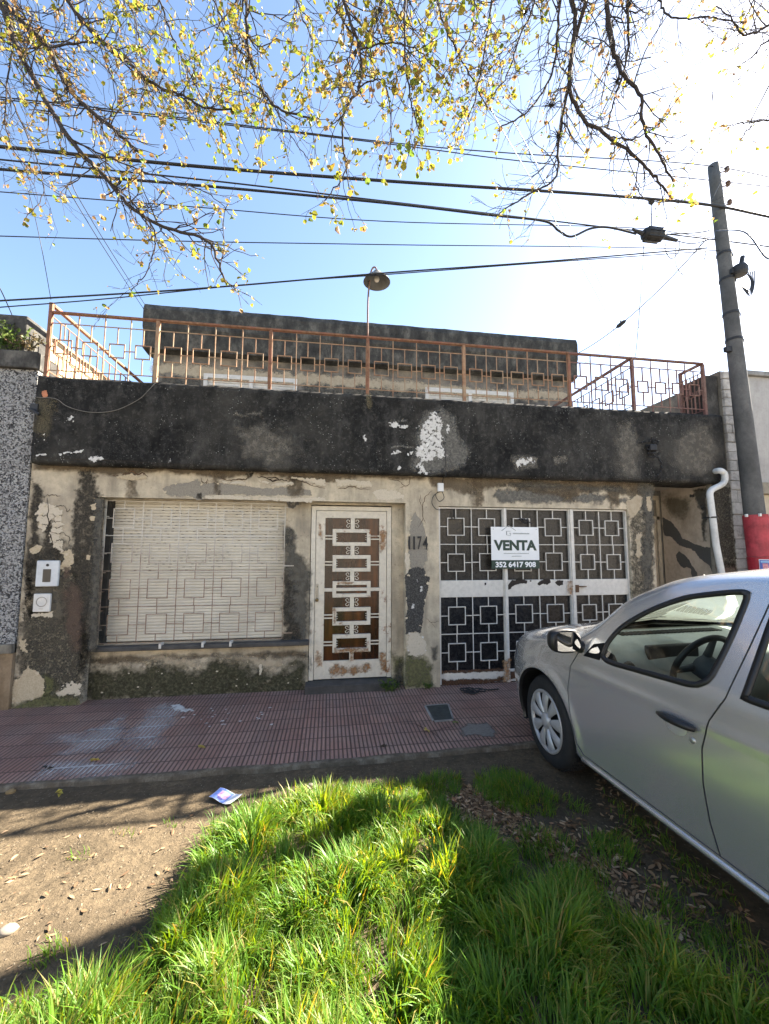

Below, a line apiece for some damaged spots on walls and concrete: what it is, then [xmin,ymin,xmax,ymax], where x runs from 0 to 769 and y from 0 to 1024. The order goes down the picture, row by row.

water stain [161,376,200,386]
water stain [305,381,423,398]
peeling [389,411,450,475]
peeling [163,479,326,503]
water stain [667,426,738,573]
peeling [29,502,90,571]
water stain [14,408,655,700]
spalling [404,512,430,657]
peeling [12,666,82,702]
rust [316,647,387,676]